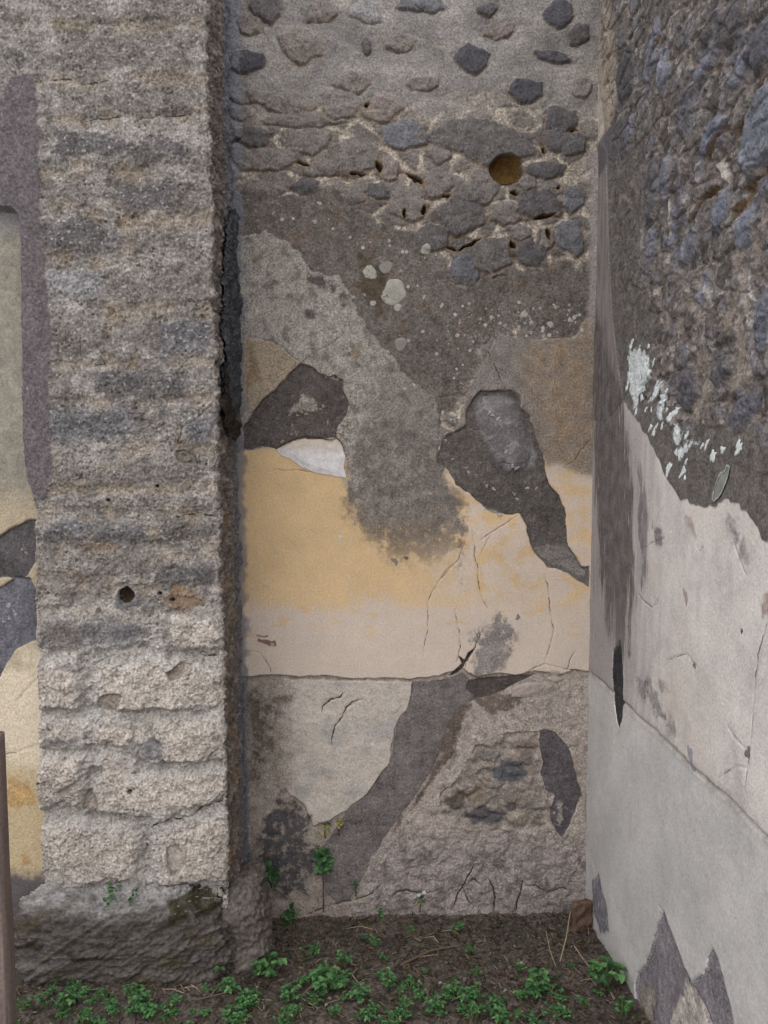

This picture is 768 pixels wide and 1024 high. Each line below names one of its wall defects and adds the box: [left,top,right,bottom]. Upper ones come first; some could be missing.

flaking render [218,209,354,478]
flaking render [437,390,590,587]
peeling [634,388,681,436]
peeling [665,431,689,481]
peeling [700,439,742,463]
crack [423,521,509,650]
water stain [247,691,291,780]
crack [322,691,362,745]
spalling [319,649,582,904]
water stain [258,796,319,898]
flaking render [635,913,734,1024]